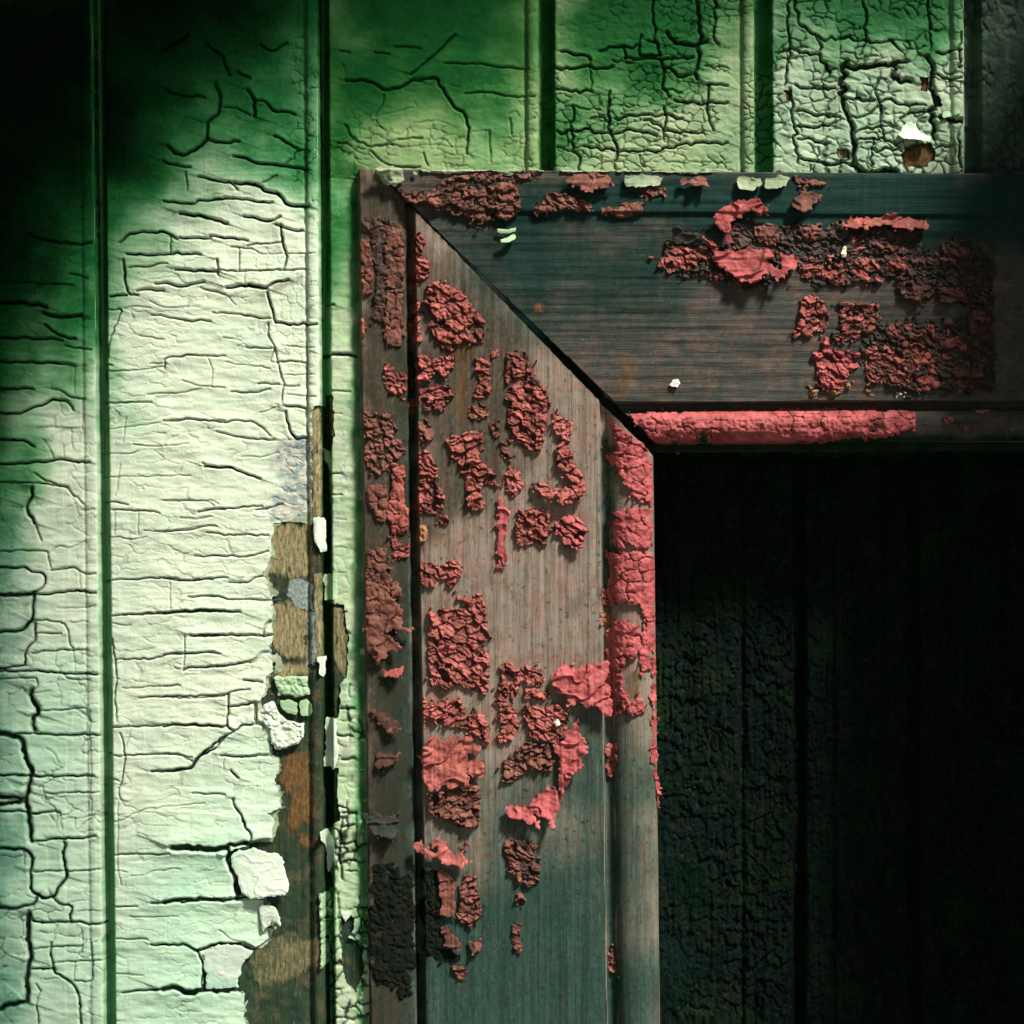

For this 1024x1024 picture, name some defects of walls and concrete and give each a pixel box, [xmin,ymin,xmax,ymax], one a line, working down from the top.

crack [557,0,727,167]
crack [778,0,963,173]
peeling [898,122,931,167]
crack [0,115,352,1024]
spalling [260,397,347,750]
peeling [358,164,999,1000]
peeling [324,717,339,770]
peeling [231,847,289,931]
peeling [320,828,335,872]
peeling [318,890,351,969]